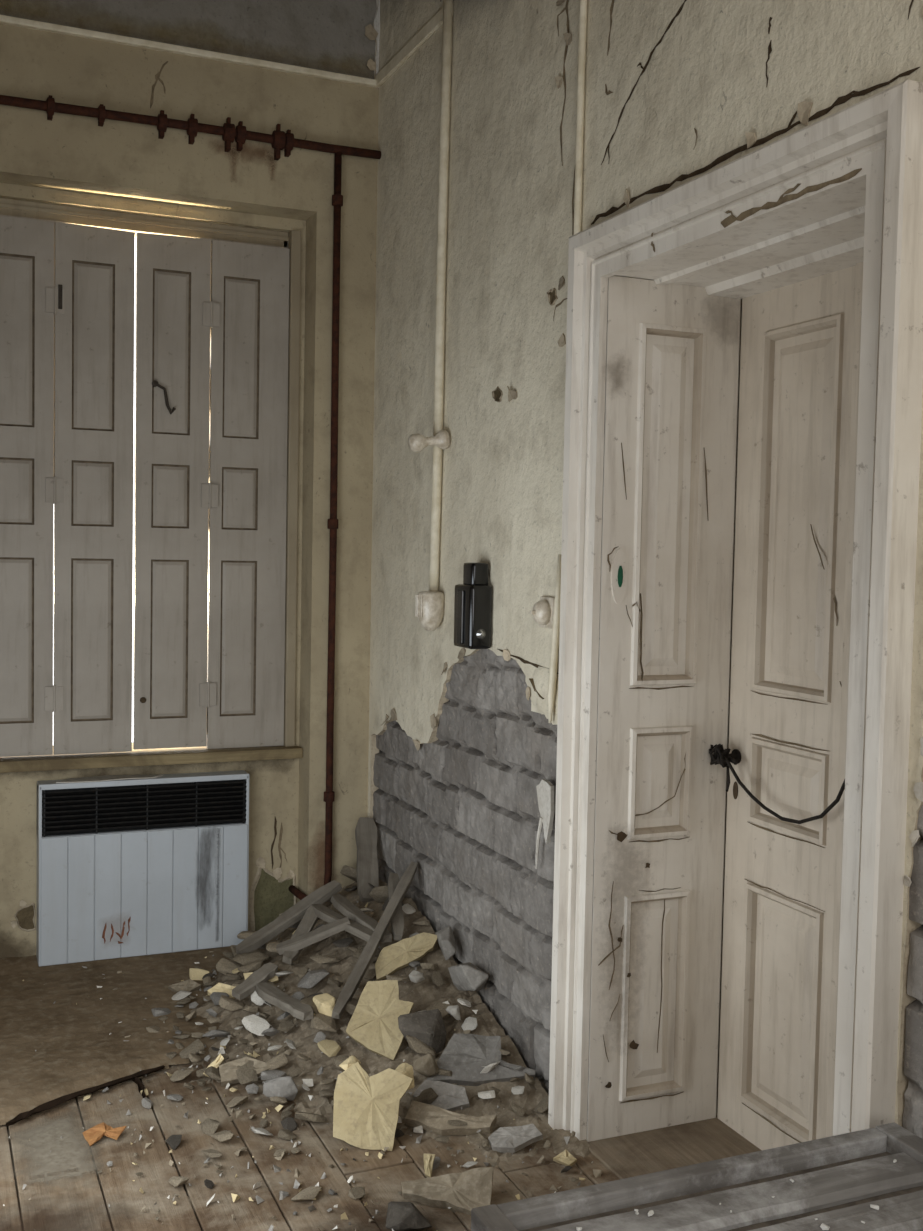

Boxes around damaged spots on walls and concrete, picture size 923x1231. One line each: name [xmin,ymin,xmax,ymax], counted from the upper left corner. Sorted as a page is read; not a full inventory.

crack [555,0,920,236]
crack [553,276,567,347]
flaking render [373,648,557,1095]
flaking render [902,782,923,1139]